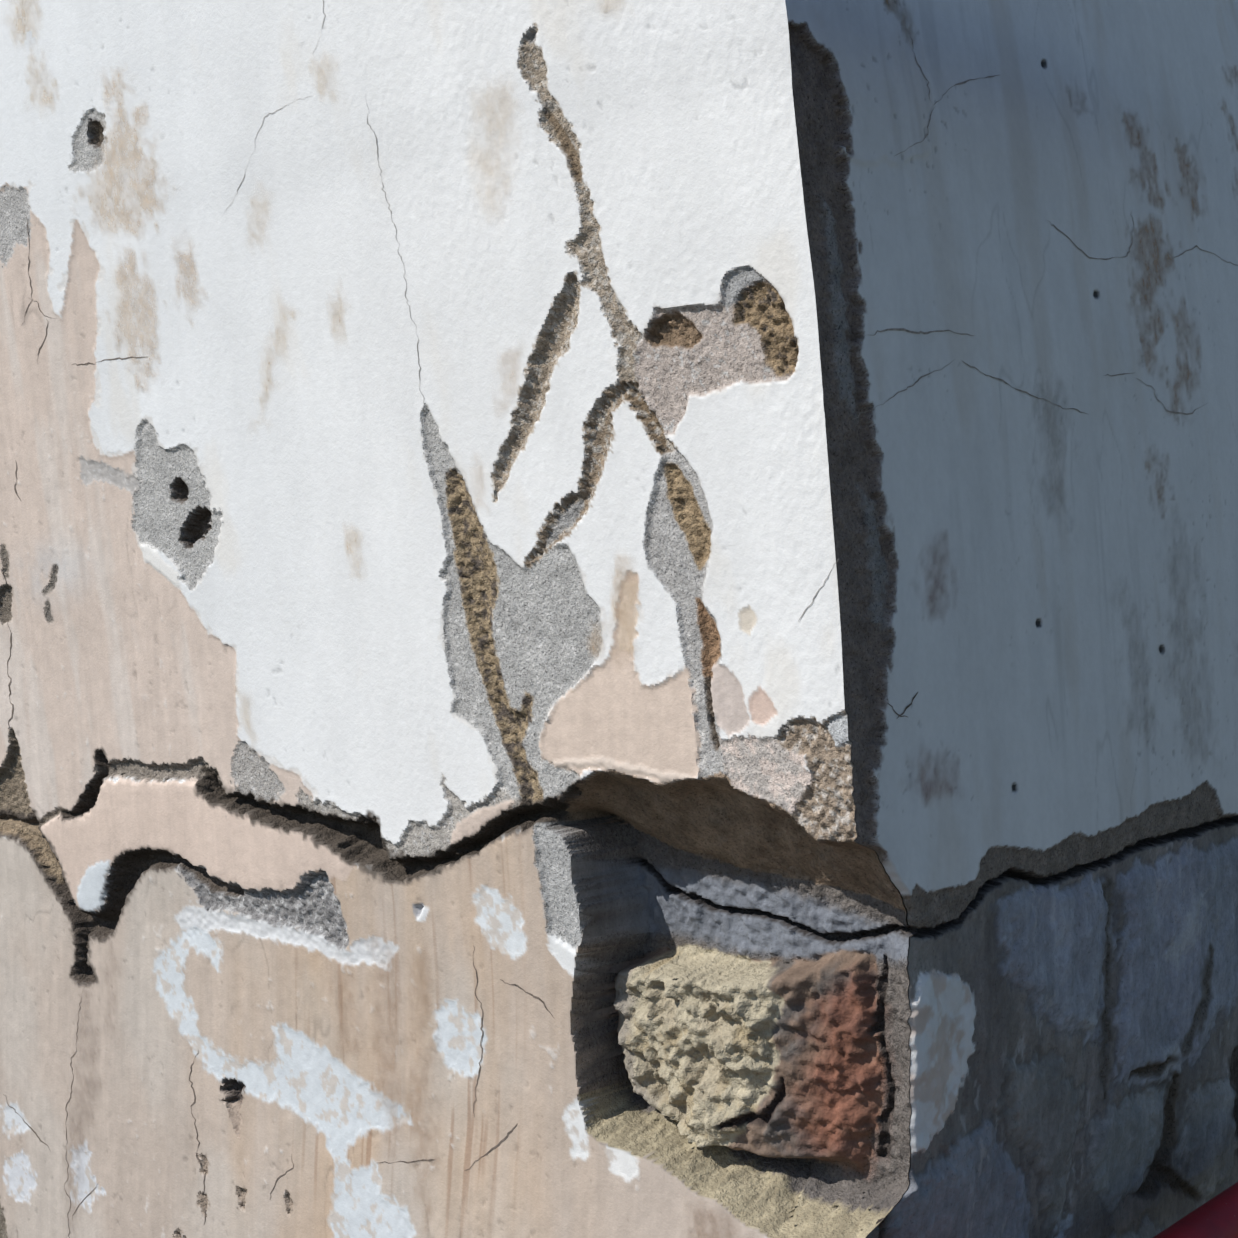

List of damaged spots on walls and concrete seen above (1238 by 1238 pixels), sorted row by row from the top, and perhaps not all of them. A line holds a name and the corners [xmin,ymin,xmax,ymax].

spalling [67,108,108,173]
crack [1047,212,1134,260]
crack [852,328,1087,420]
crack [1105,372,1207,415]
peeling [0,181,367,821]
crack [0,22,724,1238]
spalling [531,19,1238,1238]
crack [888,692,918,717]
spalling [381,772,521,859]
water stain [225,1098,242,1138]
peeling [0,1152,35,1238]
peeling [72,1148,105,1209]